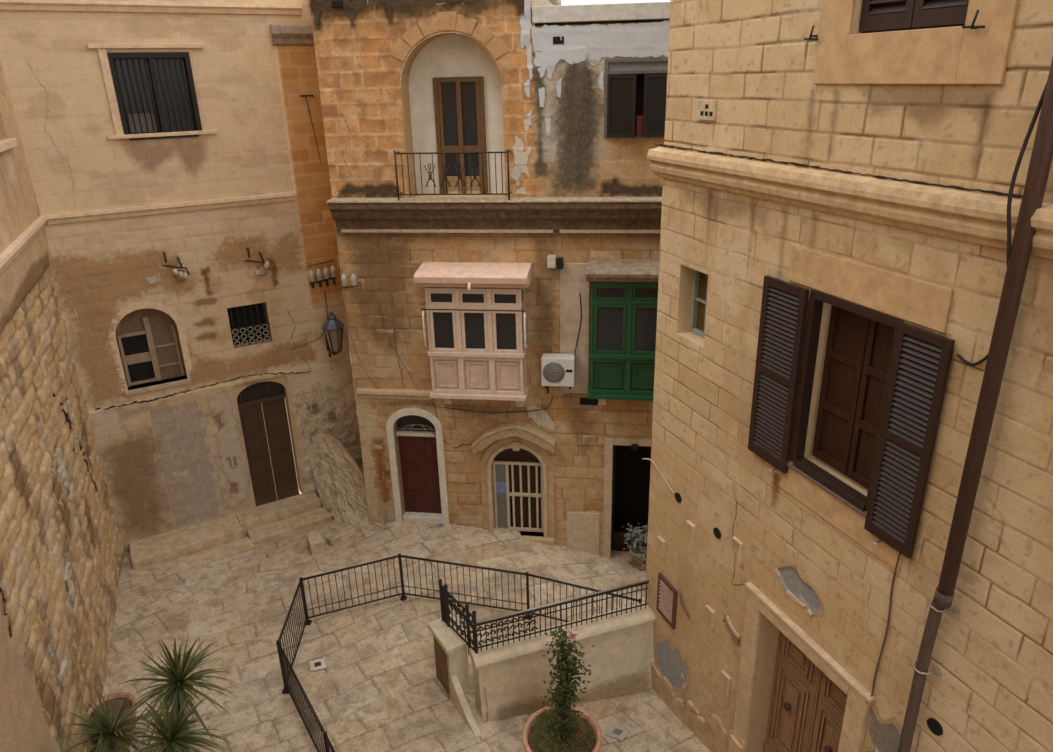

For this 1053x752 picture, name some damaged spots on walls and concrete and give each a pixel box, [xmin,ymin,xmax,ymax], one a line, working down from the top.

water stain [309,0,524,29]
peeling [520,0,670,136]
water stain [533,51,662,197]
crack [731,493,745,586]
flaking render [774,563,824,616]
flaking render [723,615,740,646]
peeling [654,636,690,695]
peeling [866,704,902,752]